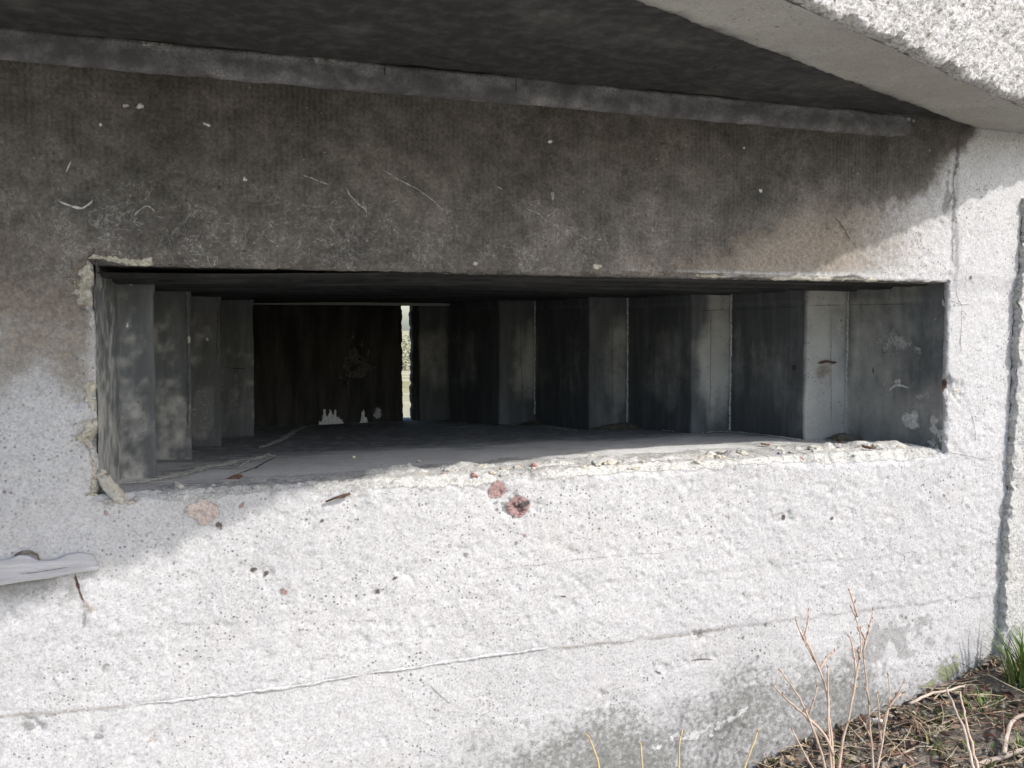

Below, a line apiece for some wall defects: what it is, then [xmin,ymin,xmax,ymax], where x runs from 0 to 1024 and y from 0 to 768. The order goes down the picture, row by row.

spalling [68,254,154,306]
spalling [73,381,114,515]